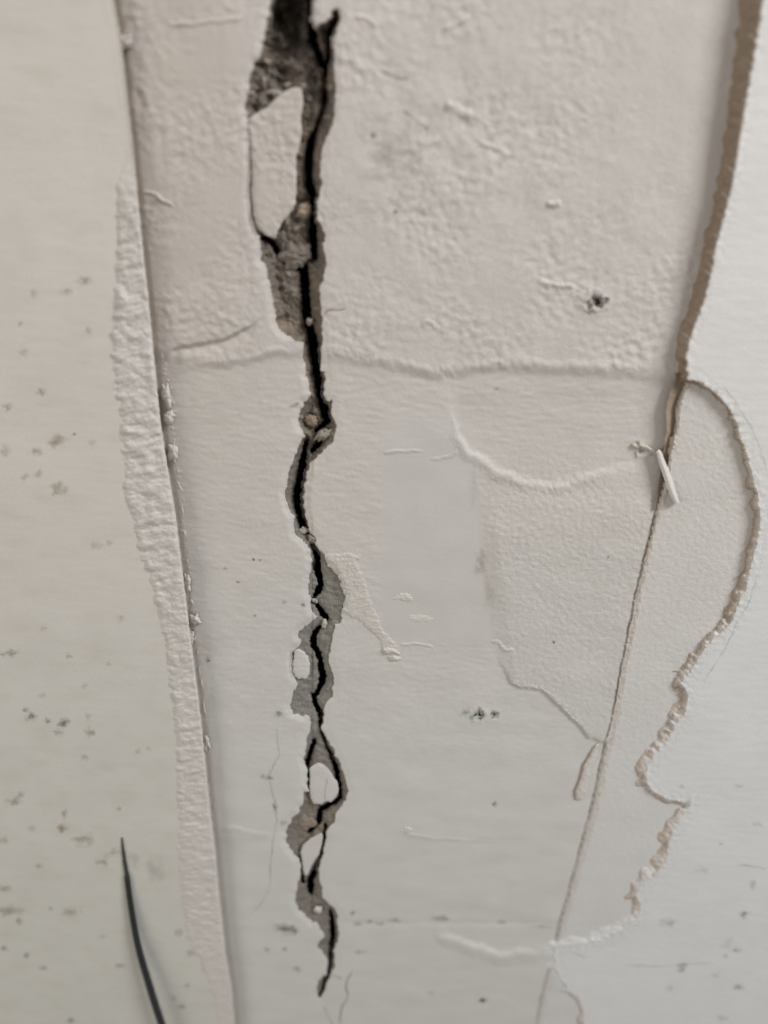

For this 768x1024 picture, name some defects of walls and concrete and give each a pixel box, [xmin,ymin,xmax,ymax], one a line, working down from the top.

crack [244,0,349,1010]
spalling [325,552,399,656]
crack [557,373,690,941]